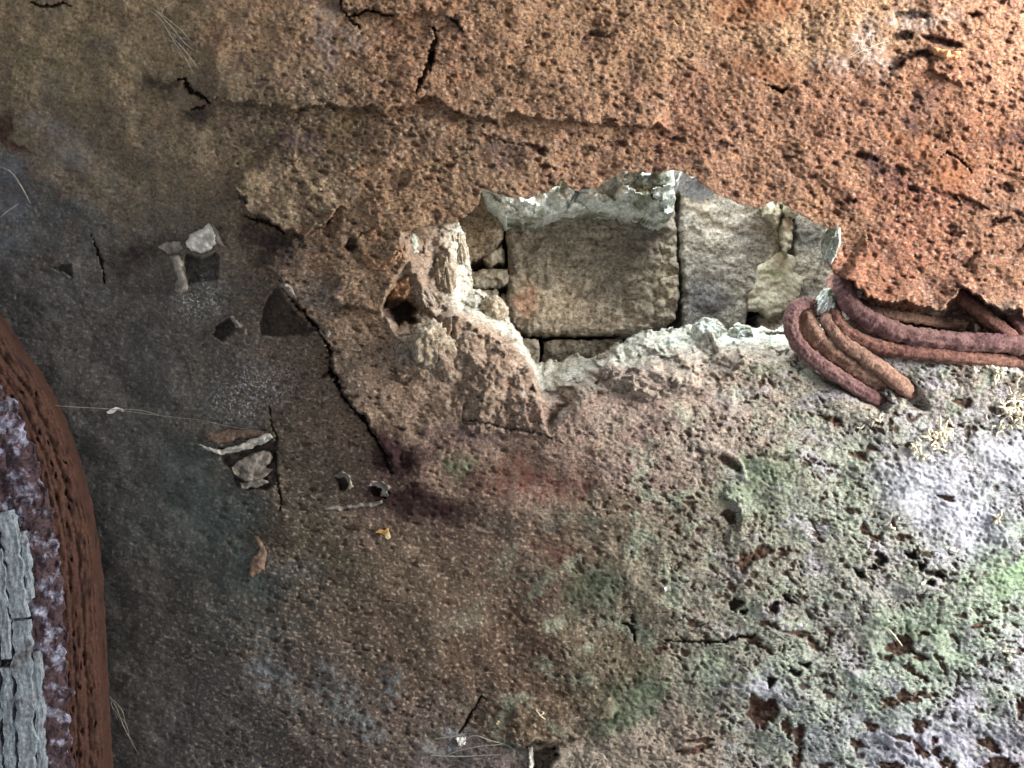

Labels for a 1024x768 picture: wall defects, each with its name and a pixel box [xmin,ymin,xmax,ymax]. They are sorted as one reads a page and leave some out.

crack [416,17,463,92]
crack [178,78,210,109]
spalling [482,170,714,231]
flaking render [158,223,225,294]
spalling [381,222,798,437]
rust [783,272,1024,406]
crack [285,290,393,473]
flaking render [199,428,277,490]
water stain [987,445,1024,486]
water stain [891,465,1005,546]
crack [664,634,756,645]
water stain [880,733,984,768]